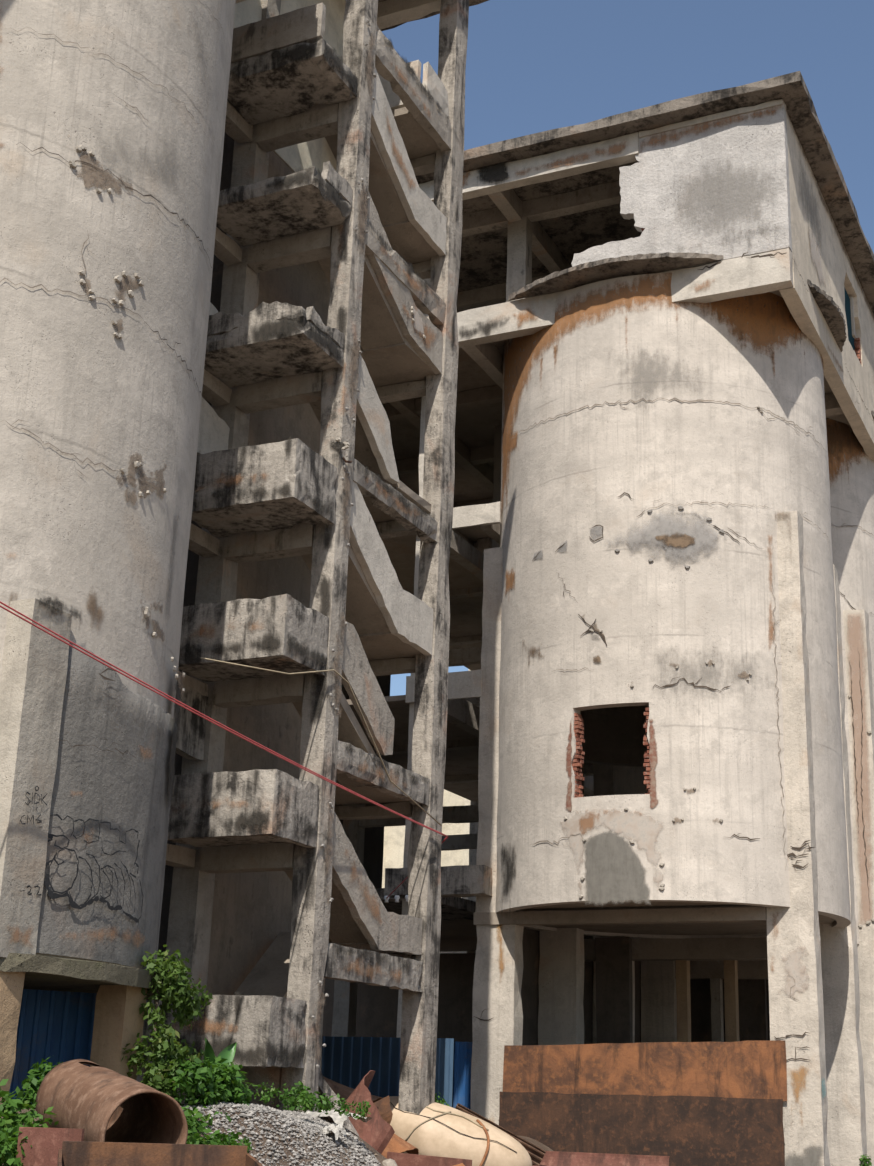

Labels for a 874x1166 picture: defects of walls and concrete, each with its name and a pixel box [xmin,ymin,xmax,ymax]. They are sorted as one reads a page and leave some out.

crack [1,28,205,133]
spalling [69,145,133,195]
crack [16,142,213,275]
crack [0,230,203,402]
spalling [111,271,144,339]
crack [511,398,827,452]
spalling [117,453,167,504]
crack [618,492,772,543]
crack [653,677,730,692]
crack [728,572,814,871]
damp [585,832,649,904]